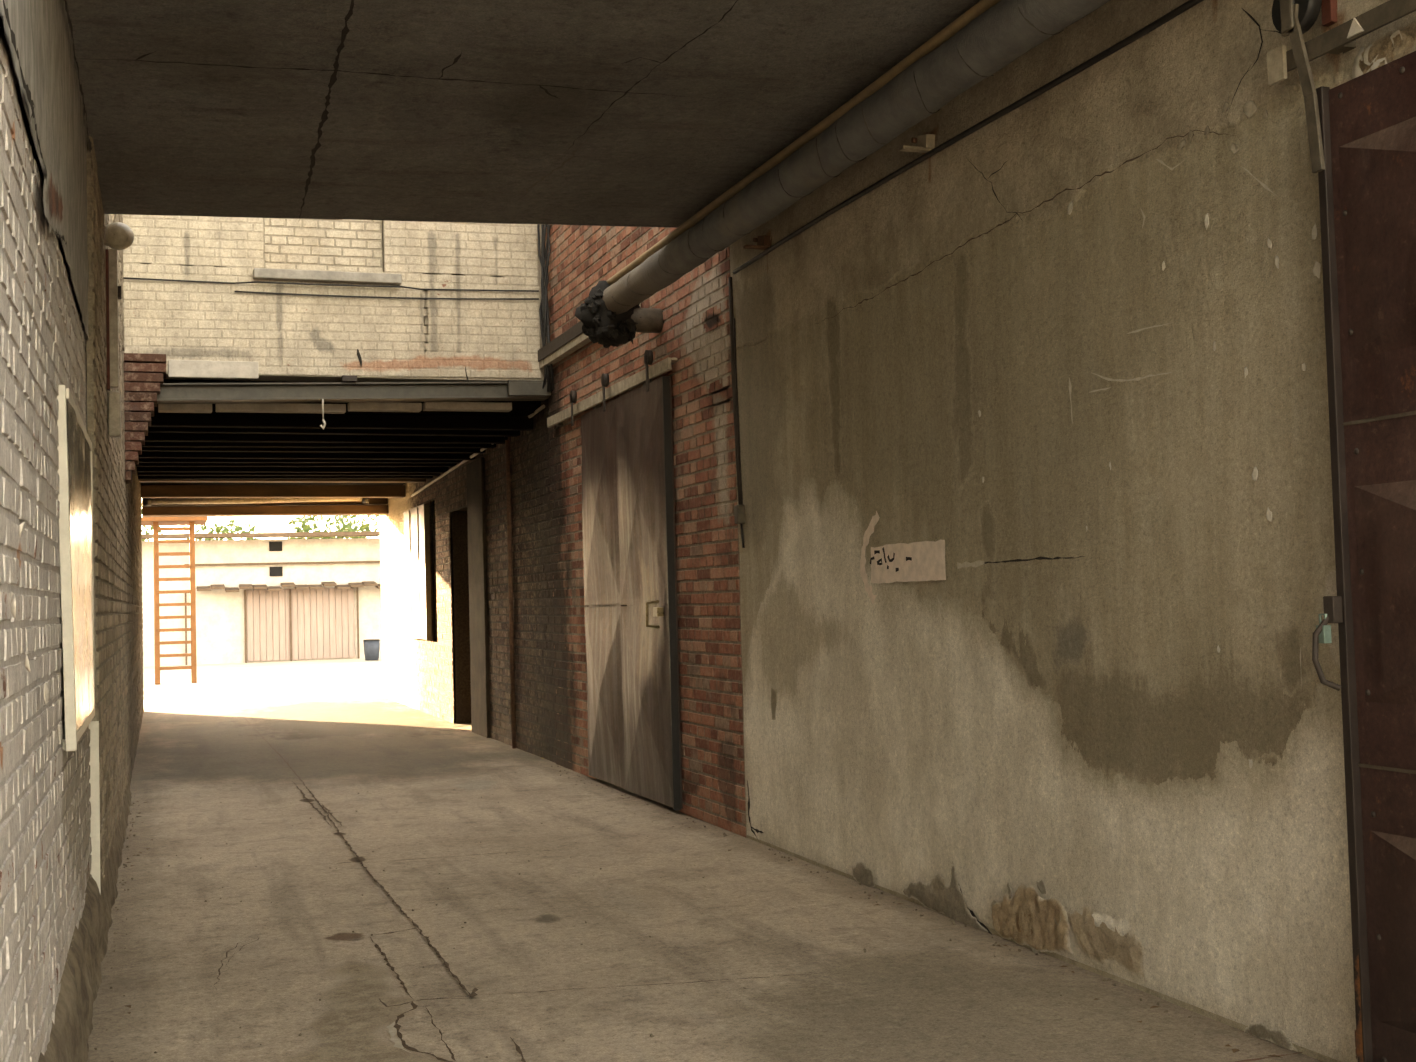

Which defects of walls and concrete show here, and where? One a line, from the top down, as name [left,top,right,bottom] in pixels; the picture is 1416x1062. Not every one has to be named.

crack [64,0,738,222]
crack [1226,8,1282,118]
water stain [677,250,735,541]
crack [957,556,1085,569]
water stain [692,101,1358,1062]
crack [229,700,818,1062]
spalling [852,861,875,887]
spalling [903,861,1148,985]
corrosion [1354,948,1363,1062]